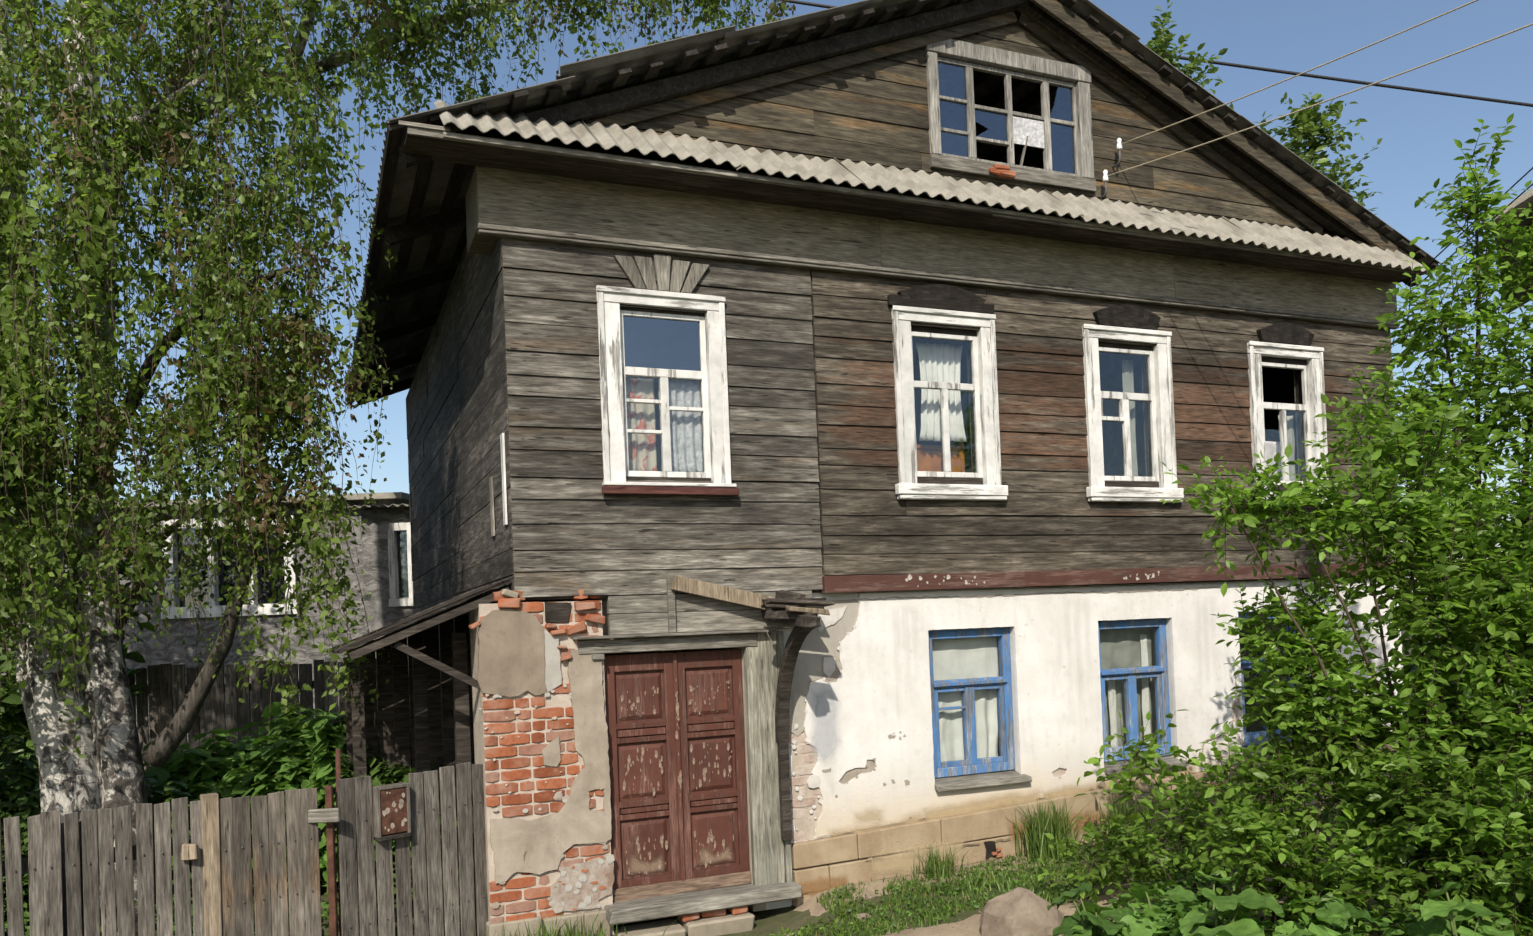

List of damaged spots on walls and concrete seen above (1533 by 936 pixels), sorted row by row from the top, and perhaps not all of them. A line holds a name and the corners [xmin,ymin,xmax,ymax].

spalling [469,589,606,662]
peeling [479,683,604,817]
peeling [620,679,732,796]
flaking render [789,597,910,842]
peeling [489,834,668,924]
peeling [694,829,734,868]